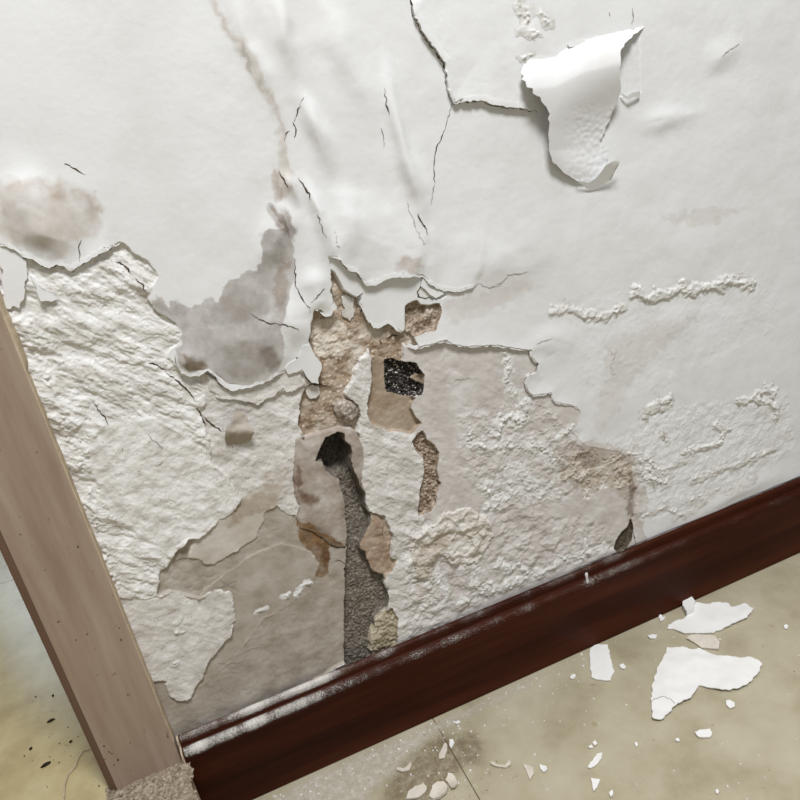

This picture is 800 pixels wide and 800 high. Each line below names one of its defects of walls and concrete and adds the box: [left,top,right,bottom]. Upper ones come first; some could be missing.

crack [279,171,327,238]
crack [418,104,452,234]
peeling [521,27,643,191]
crack [294,266,324,313]
flaking render [0,242,709,750]